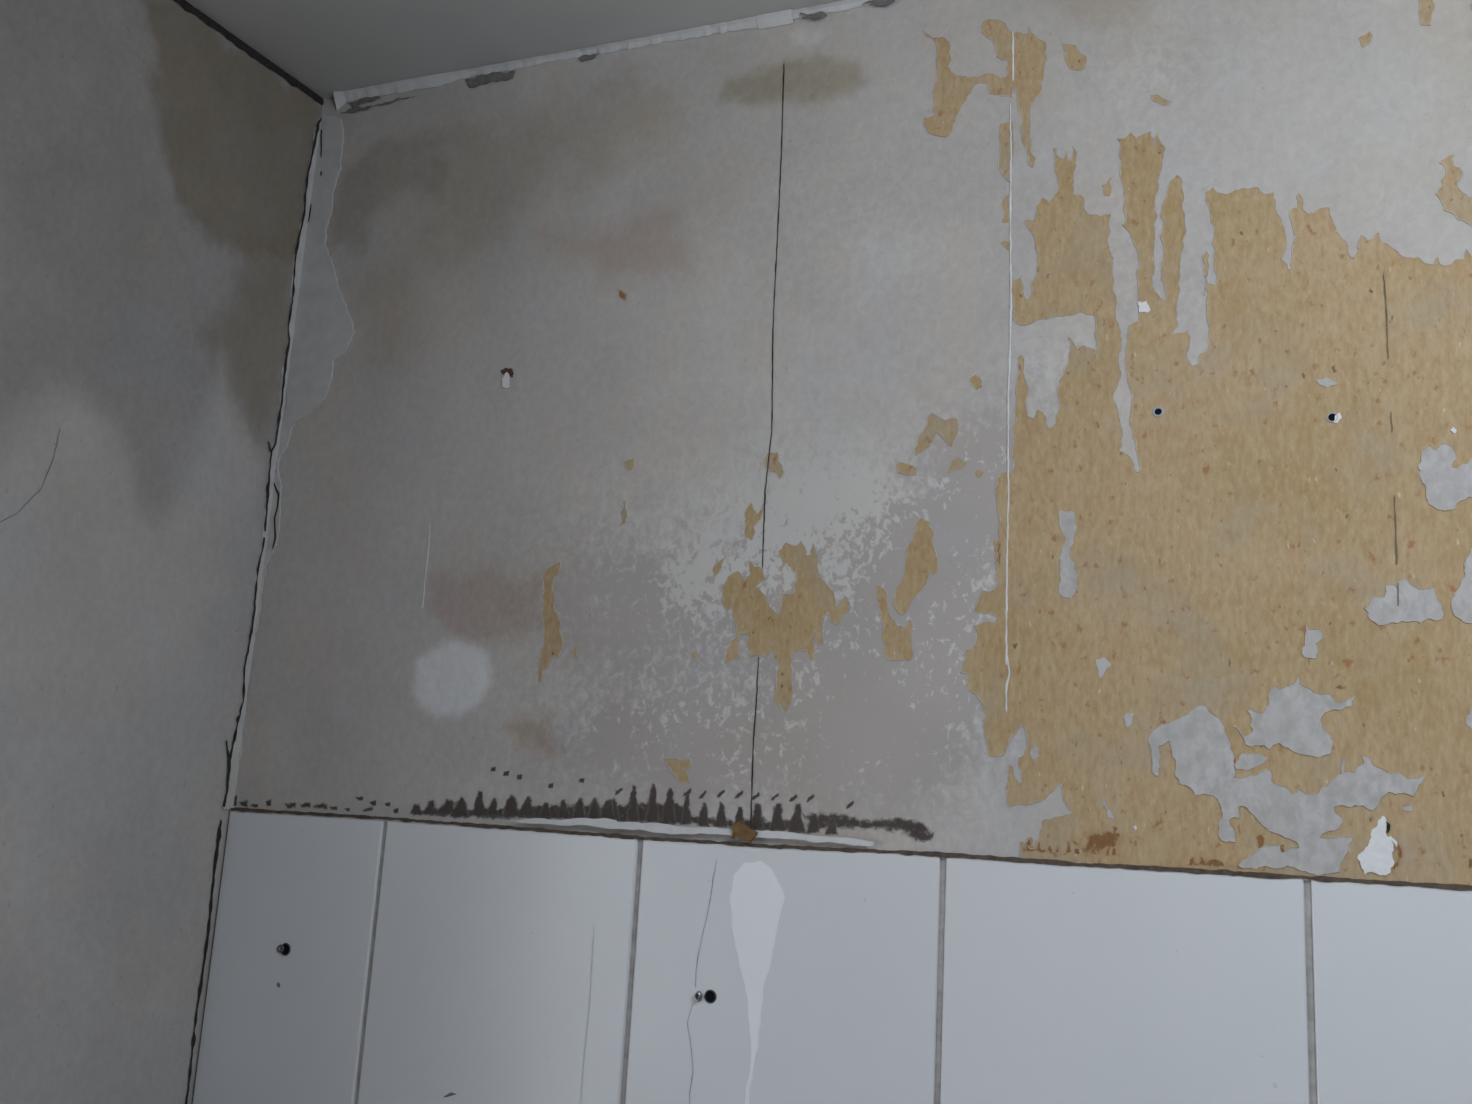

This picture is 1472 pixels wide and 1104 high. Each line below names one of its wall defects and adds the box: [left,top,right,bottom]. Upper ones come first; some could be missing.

peeling [1418,0,1435,26]
leakage [132,0,322,459]
leakage [326,44,877,396]
peeling [537,561,578,683]
peeling [745,502,764,540]
peeling [765,452,783,479]
peeling [712,541,850,712]
peeling [876,517,939,661]
peeling [897,19,1472,885]